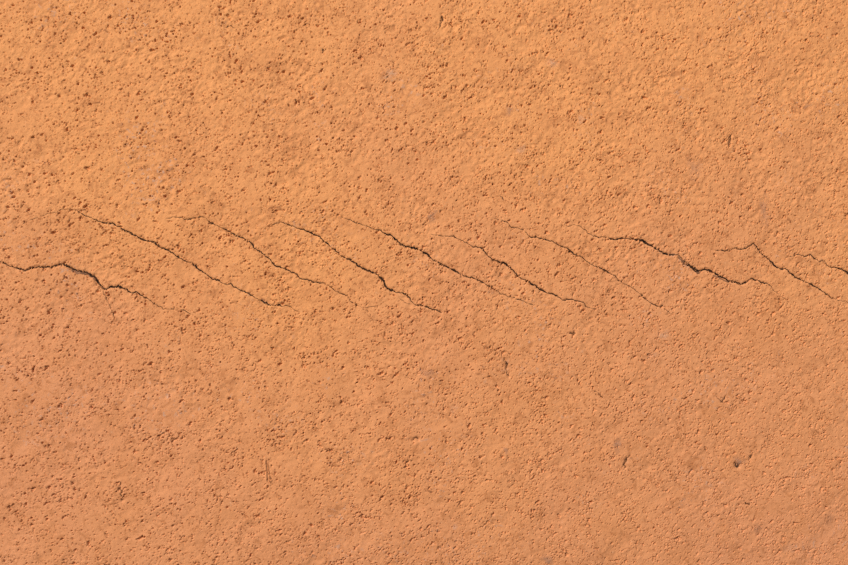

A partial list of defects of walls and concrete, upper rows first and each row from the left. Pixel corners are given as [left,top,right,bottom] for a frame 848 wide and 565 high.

crack [0,261,189,318]
crack [23,208,299,312]
crack [168,216,375,311]
crack [269,221,441,313]
crack [345,218,595,309]
crack [494,196,848,312]